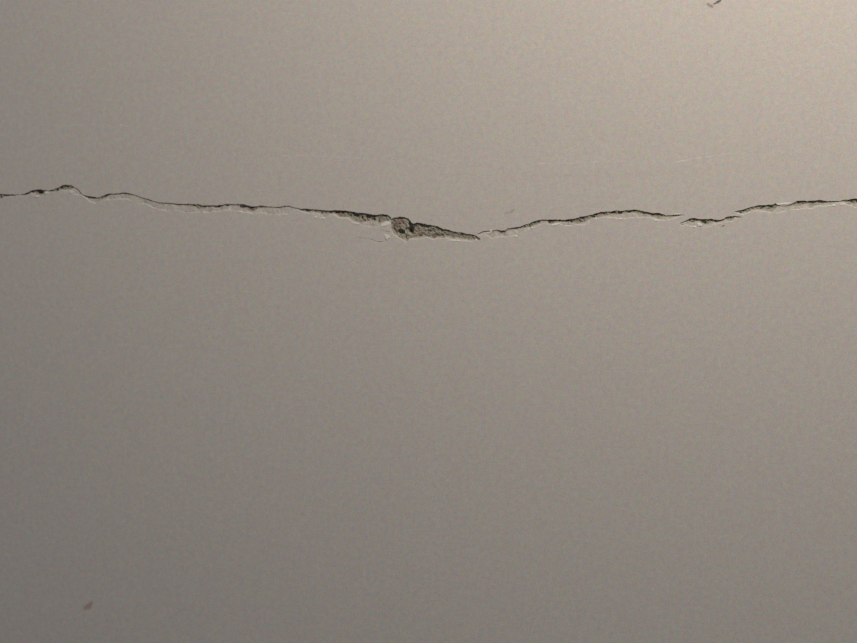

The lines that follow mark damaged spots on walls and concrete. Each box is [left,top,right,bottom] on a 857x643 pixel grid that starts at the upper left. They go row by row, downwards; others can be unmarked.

crack [0,185,391,228]
crack [477,198,857,239]